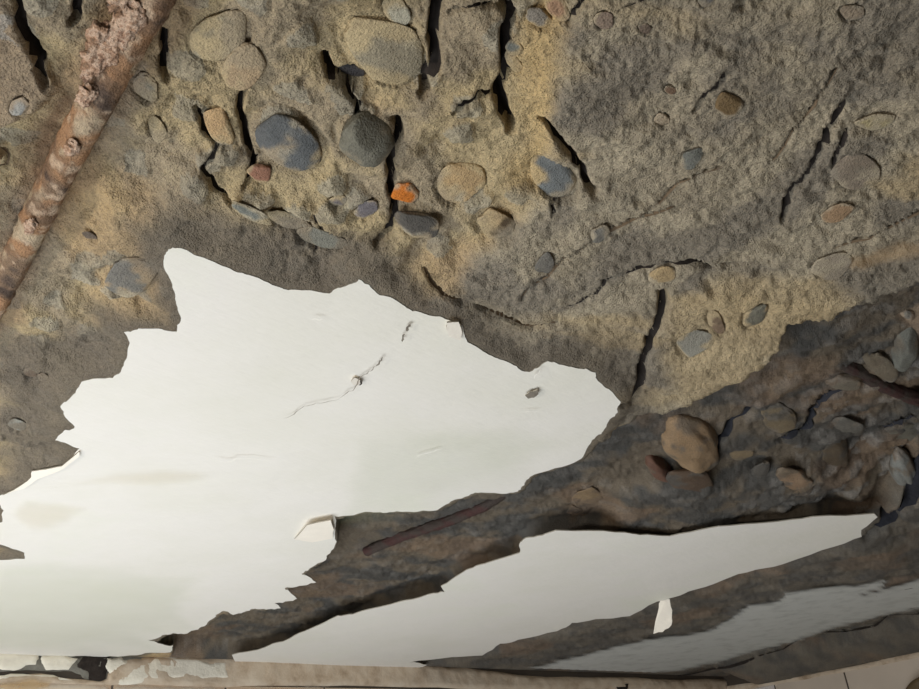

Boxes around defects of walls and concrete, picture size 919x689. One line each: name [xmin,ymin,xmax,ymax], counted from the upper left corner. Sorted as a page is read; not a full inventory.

crack [15,0,48,77]
crack [159,27,169,67]
crack [198,107,228,195]
crack [237,90,258,178]
crack [323,50,361,112]
crack [384,115,402,229]
crack [420,0,516,115]
crack [545,117,591,183]
crack [770,68,848,217]
spalling [0,0,578,495]
spalling [417,0,919,685]
spalling [0,388,725,685]